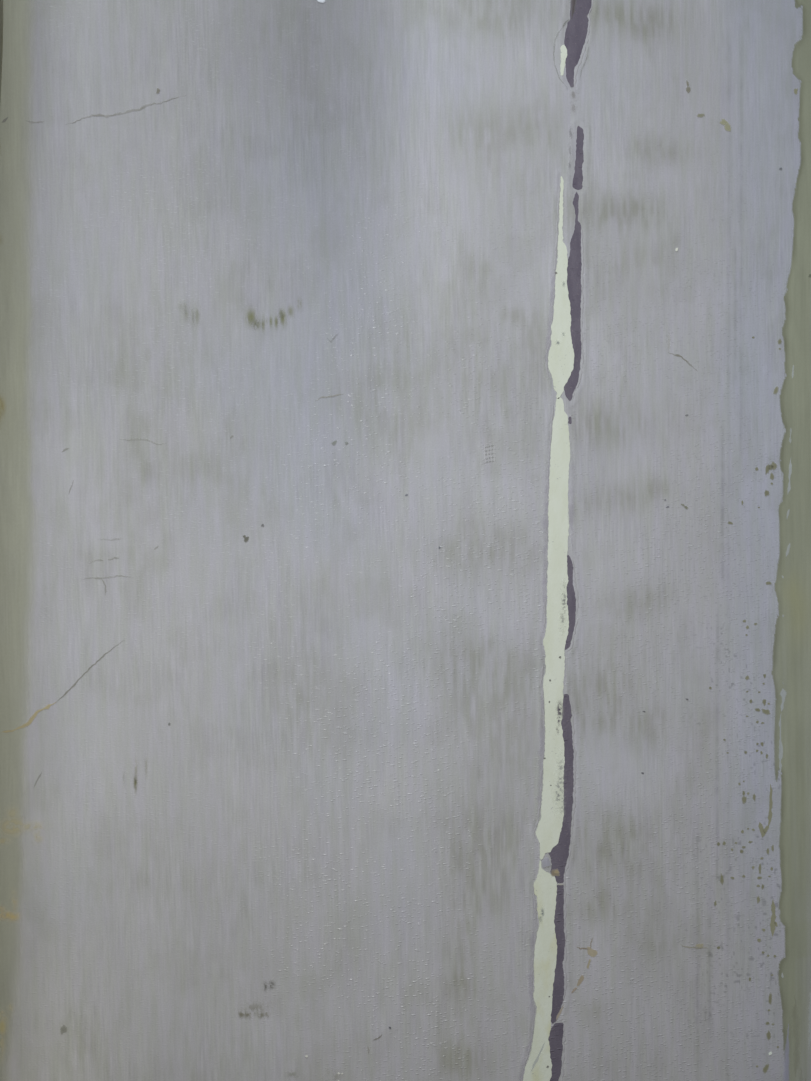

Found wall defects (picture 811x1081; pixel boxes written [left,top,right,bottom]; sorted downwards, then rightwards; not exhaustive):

crack [73,97,177,123]
peeling [520,126,597,1081]
peeling [553,0,593,110]
peeling [717,0,811,1081]